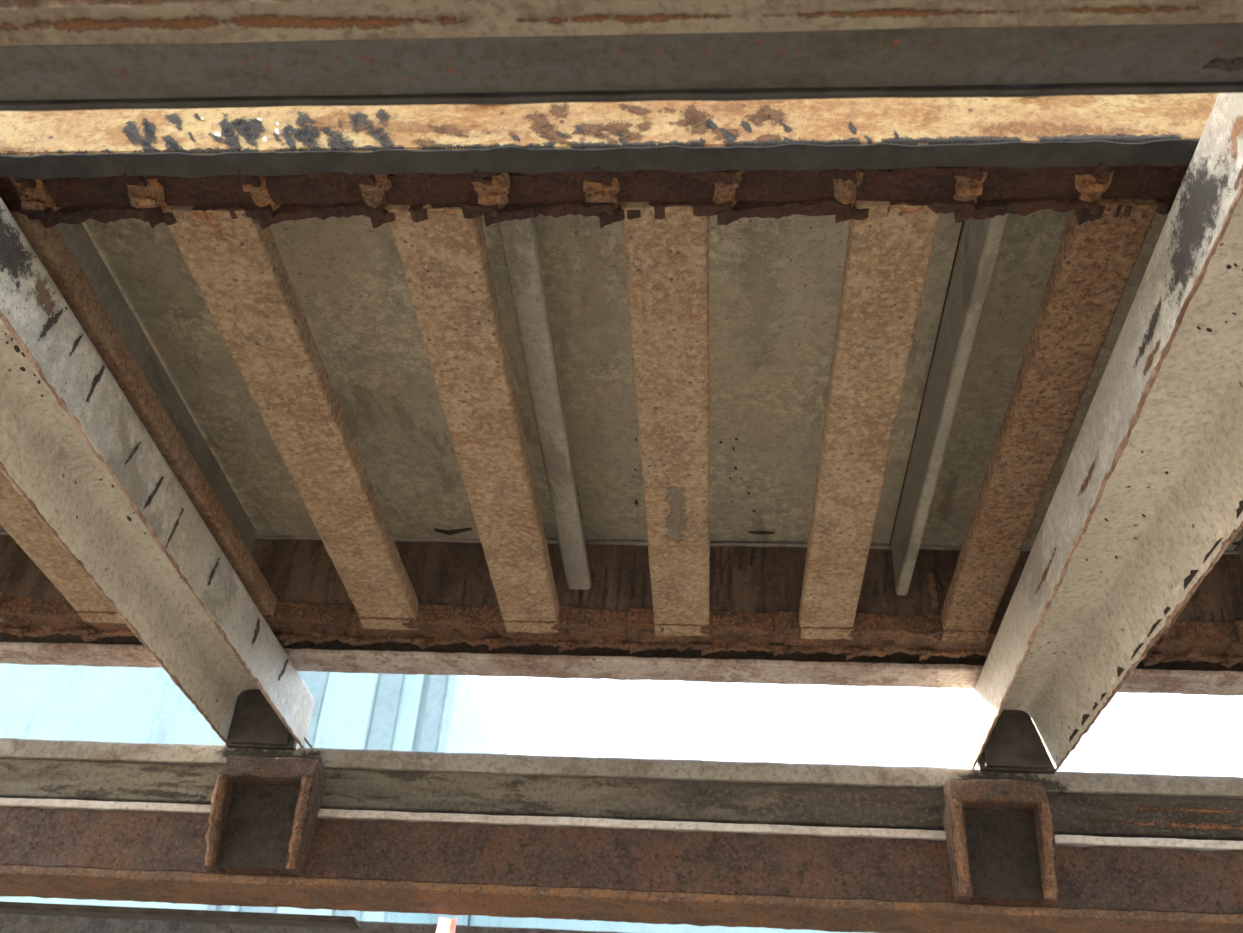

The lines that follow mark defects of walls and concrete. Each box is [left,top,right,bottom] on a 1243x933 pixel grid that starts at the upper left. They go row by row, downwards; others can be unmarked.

corrosion [0,14,464,33]
corrosion [517,12,730,25]
corrosion [798,8,1019,19]
corrosion [1046,5,1199,15]
peeling [122,109,393,153]
peeling [414,124,469,150]
peeling [511,104,801,146]
corrosion [1143,340,1160,375]
corrosion [1078,461,1095,495]
corrosion [1184,538,1223,590]
corrosion [1117,607,1171,678]
corrosion [1069,692,1107,743]